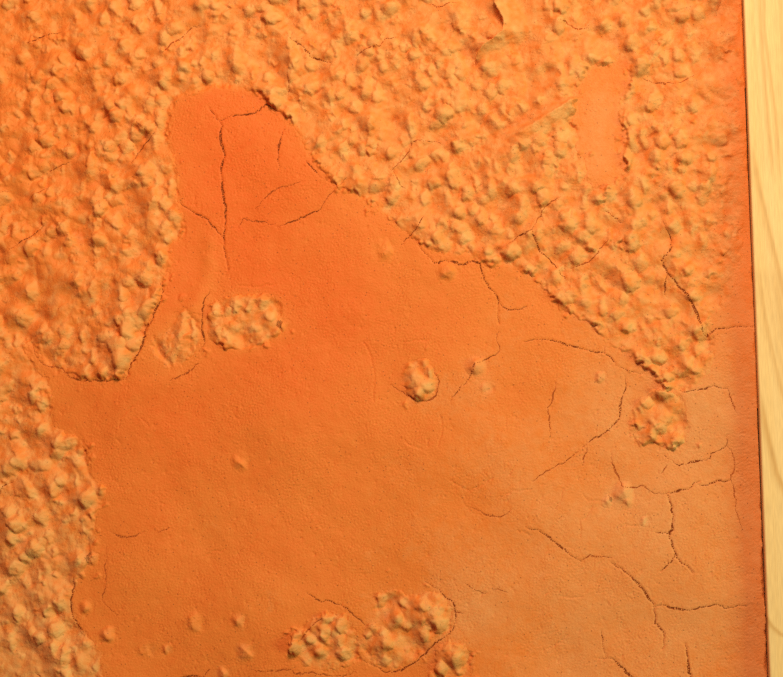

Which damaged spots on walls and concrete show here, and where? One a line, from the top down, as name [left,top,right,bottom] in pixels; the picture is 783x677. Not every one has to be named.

peeling [475,0,534,63]
crack [181,104,346,266]
crack [390,217,527,402]
crack [661,227,742,337]
crack [533,339,633,480]
crack [612,440,741,572]
crack [253,669,353,677]
crack [302,594,375,638]
crack [373,584,461,673]
crack [531,529,744,632]